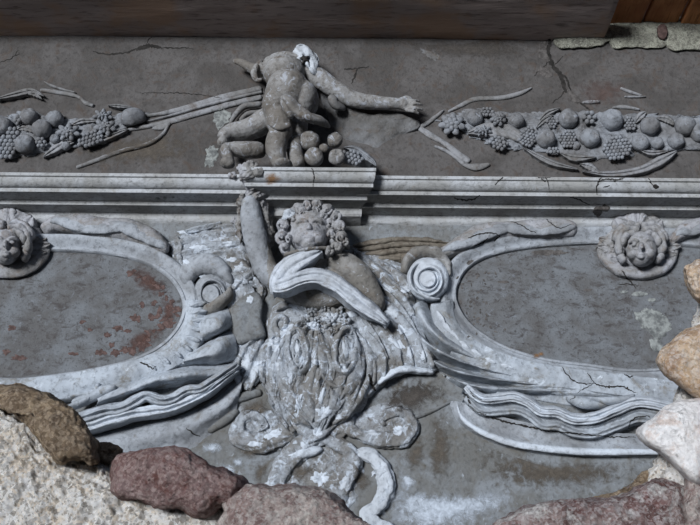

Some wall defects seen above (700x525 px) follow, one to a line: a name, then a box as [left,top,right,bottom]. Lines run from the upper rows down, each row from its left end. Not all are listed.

crack [93,37,192,55]
crack [534,39,590,110]
crack [570,177,625,205]
crack [468,232,500,246]
crack [511,219,571,233]
damp [242,401,266,413]
damp [388,382,444,411]
crack [562,367,636,400]
damp [408,423,448,473]
damp [354,472,367,490]